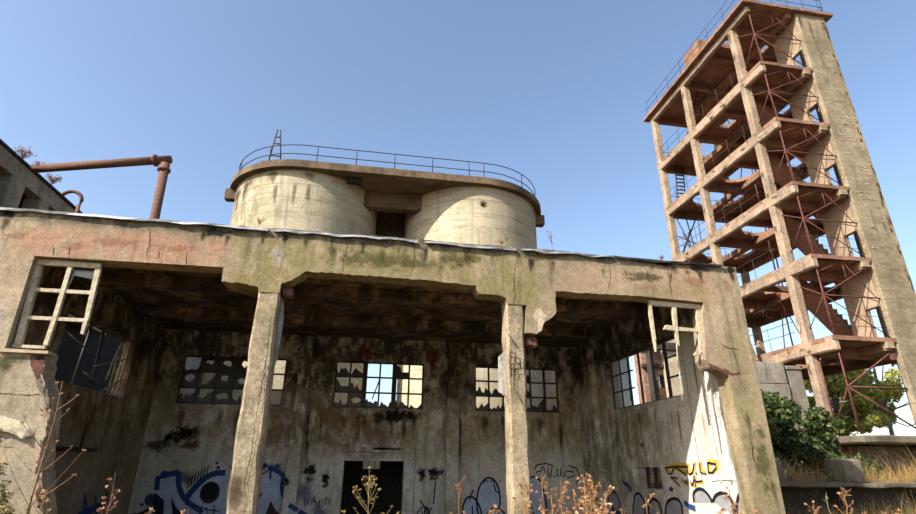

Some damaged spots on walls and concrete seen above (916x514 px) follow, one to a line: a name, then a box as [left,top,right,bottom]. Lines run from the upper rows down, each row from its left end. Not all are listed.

water stain [340,243,480,267]
peeling [524,308,547,349]
spalling [30,354,51,421]
spalling [509,352,522,388]
peeling [0,416,48,508]
water stain [756,430,769,489]